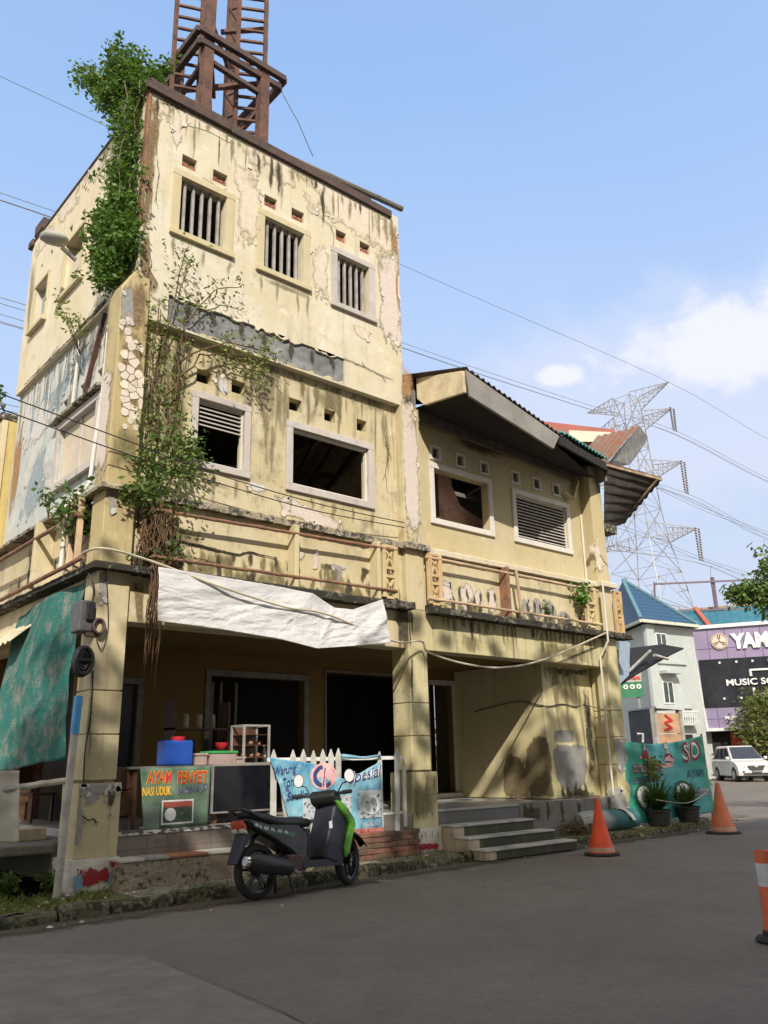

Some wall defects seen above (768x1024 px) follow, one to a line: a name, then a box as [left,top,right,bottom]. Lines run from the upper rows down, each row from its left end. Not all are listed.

damp [156,98,210,148]
peeling [152,95,402,355]
damp [218,136,393,239]
spalling [168,295,345,385]
peeling [246,482,347,531]
peeling [402,394,421,557]
damp [133,529,413,648]
damp [443,617,517,652]
damp [504,629,610,819]
spalling [75,783,122,845]